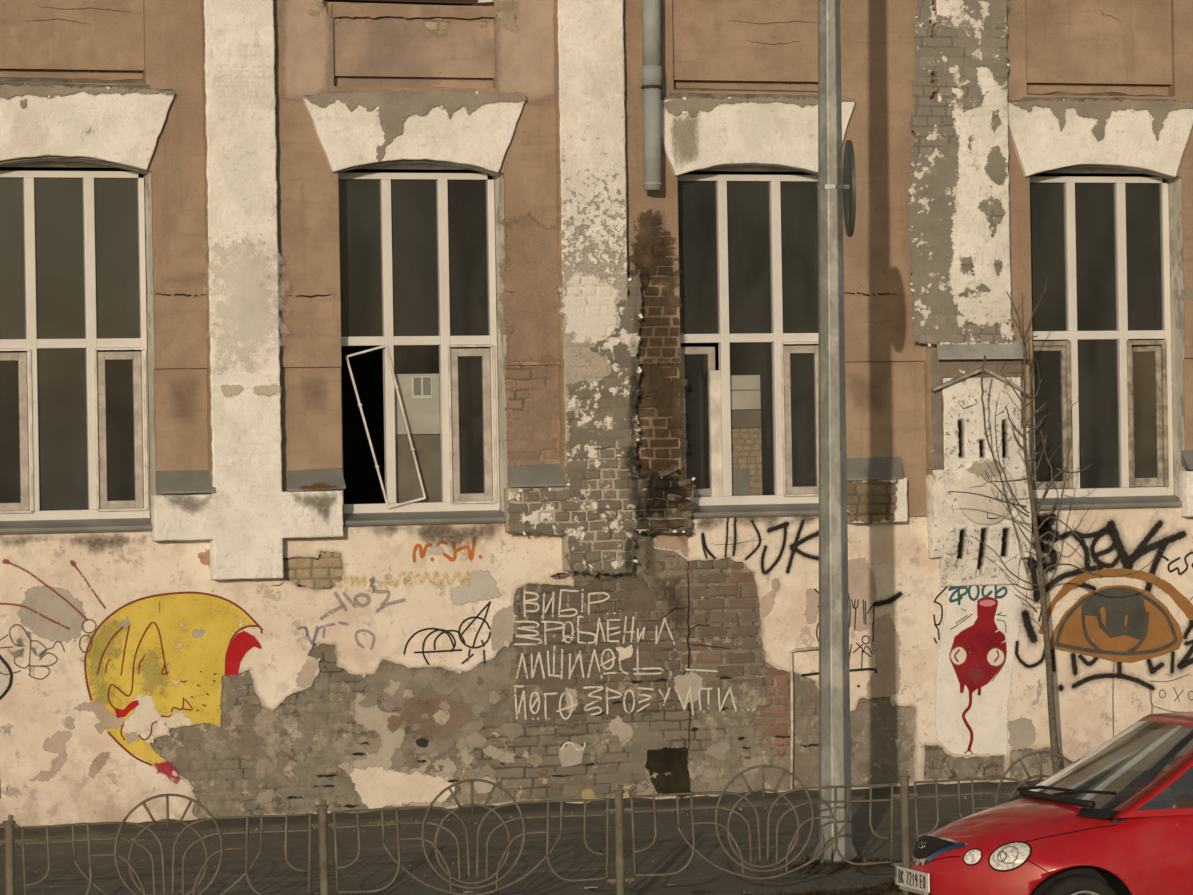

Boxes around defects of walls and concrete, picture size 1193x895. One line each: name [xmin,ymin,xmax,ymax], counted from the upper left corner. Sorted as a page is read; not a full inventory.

crack [32,6,132,24]
crack [730,20,816,45]
peeling [305,89,526,162]
peeling [907,0,1193,347]
flaking render [29,209,819,818]
flaking render [847,480,898,524]
peeling [16,586,86,643]
flaking render [848,557,1072,785]